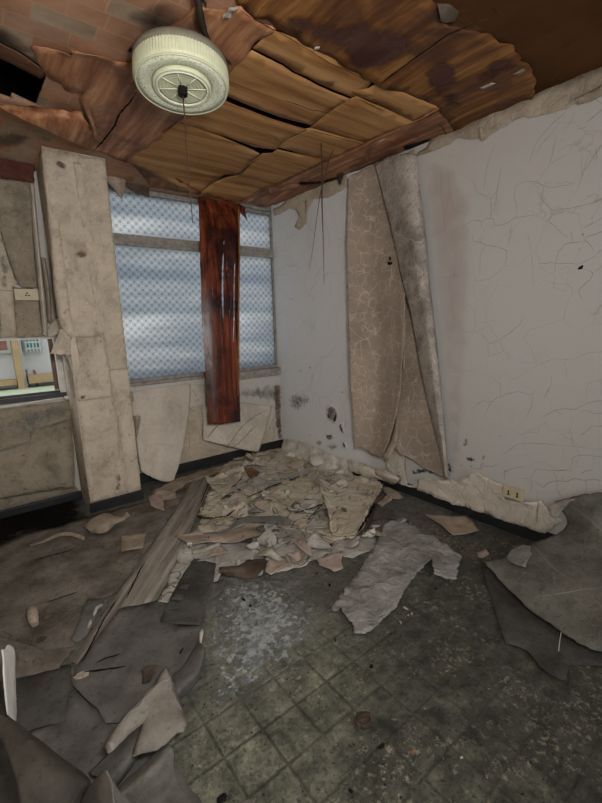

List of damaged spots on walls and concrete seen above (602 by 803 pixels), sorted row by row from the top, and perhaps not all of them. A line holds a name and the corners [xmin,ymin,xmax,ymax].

crack [94,92,137,150]
peeling [31,45,202,194]
water stain [289,18,408,68]
peeling [171,0,537,213]
water stain [432,0,602,95]
crack [453,170,602,315]